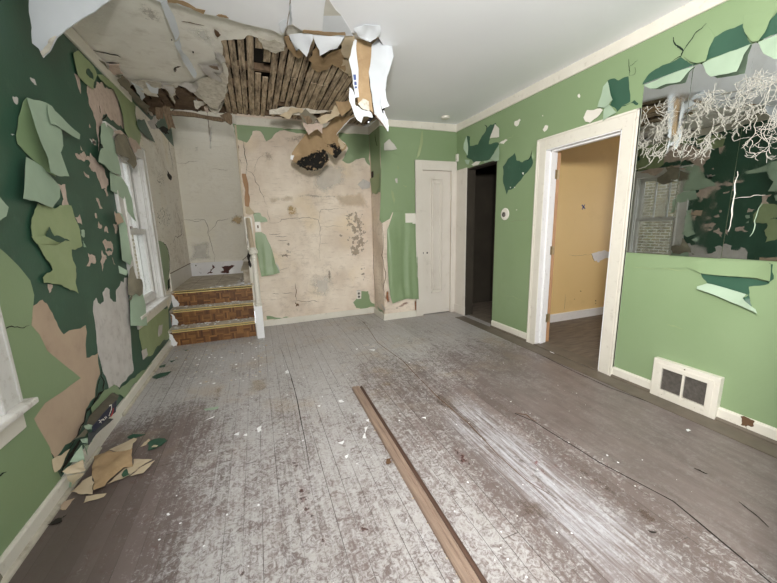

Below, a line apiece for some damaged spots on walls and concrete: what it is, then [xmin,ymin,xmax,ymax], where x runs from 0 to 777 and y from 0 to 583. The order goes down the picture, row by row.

peeling [642,8,777,89]
peeling [583,61,638,123]
peeling [0,198,9,220]
peeling [11,0,317,473]
peeling [339,123,535,314]
peeling [661,260,774,313]